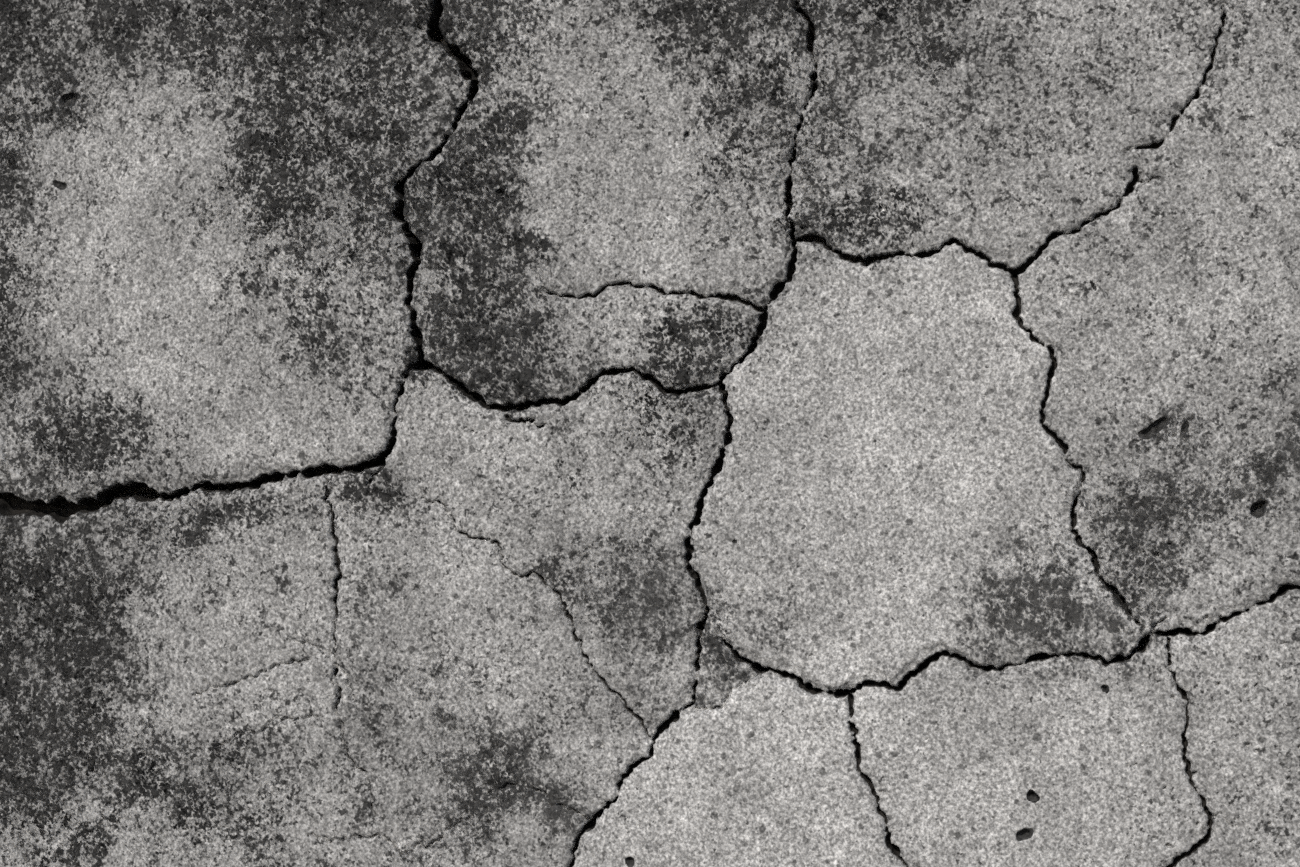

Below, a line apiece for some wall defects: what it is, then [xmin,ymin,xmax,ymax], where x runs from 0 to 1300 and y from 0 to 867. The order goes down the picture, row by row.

crack [1136,6,1226,149]
crack [0,0,1153,671]
crack [334,667,344,724]
crack [454,520,698,867]
crack [724,584,1300,867]